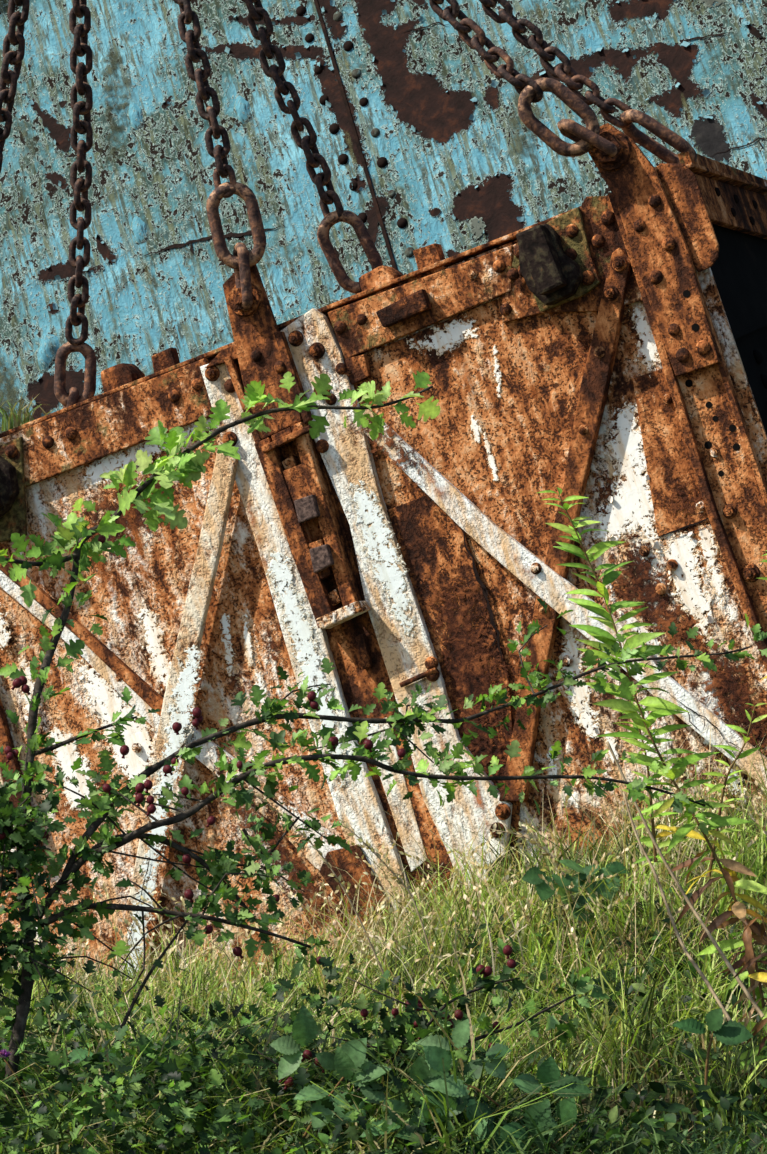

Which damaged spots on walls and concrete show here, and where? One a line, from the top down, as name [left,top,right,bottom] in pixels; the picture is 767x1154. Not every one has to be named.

peeling [175,0,504,247]
peeling [529,0,733,166]
peeling [35,233,117,285]
peeling [406,313,481,357]
peeling [428,171,527,244]
corrosion [73,470,193,596]
corrosion [346,398,444,496]
corrosion [586,464,622,527]
peeling [587,401,731,646]
corrosion [420,562,515,808]
corrosion [597,477,767,754]
corrosion [212,789,346,941]